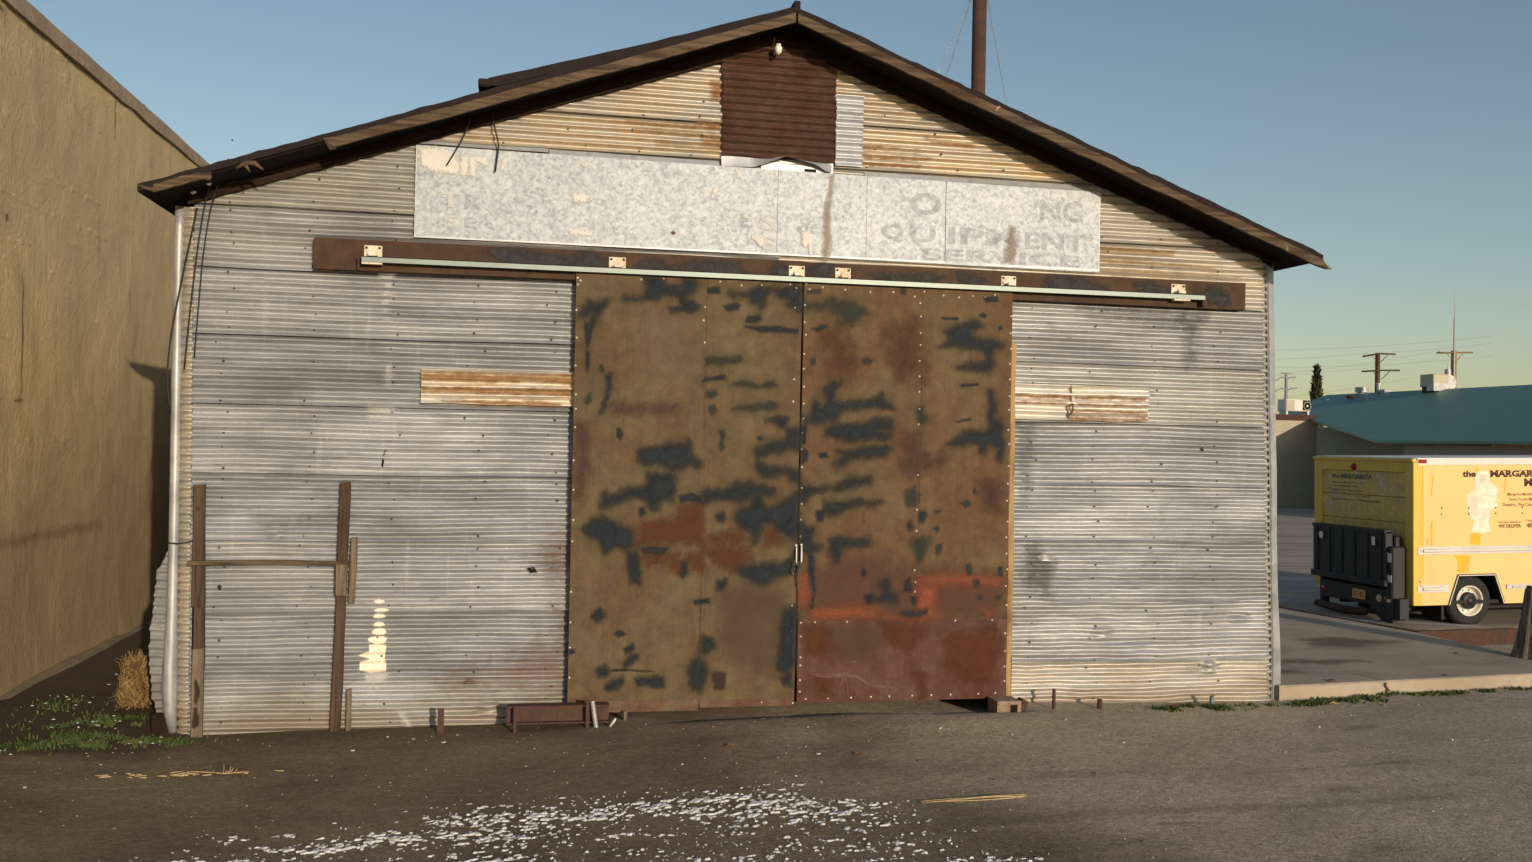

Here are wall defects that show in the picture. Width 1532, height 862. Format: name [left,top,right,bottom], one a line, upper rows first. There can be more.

rust [422,373,572,407]
rust [1015,394,1147,421]
rust [638,503,705,571]